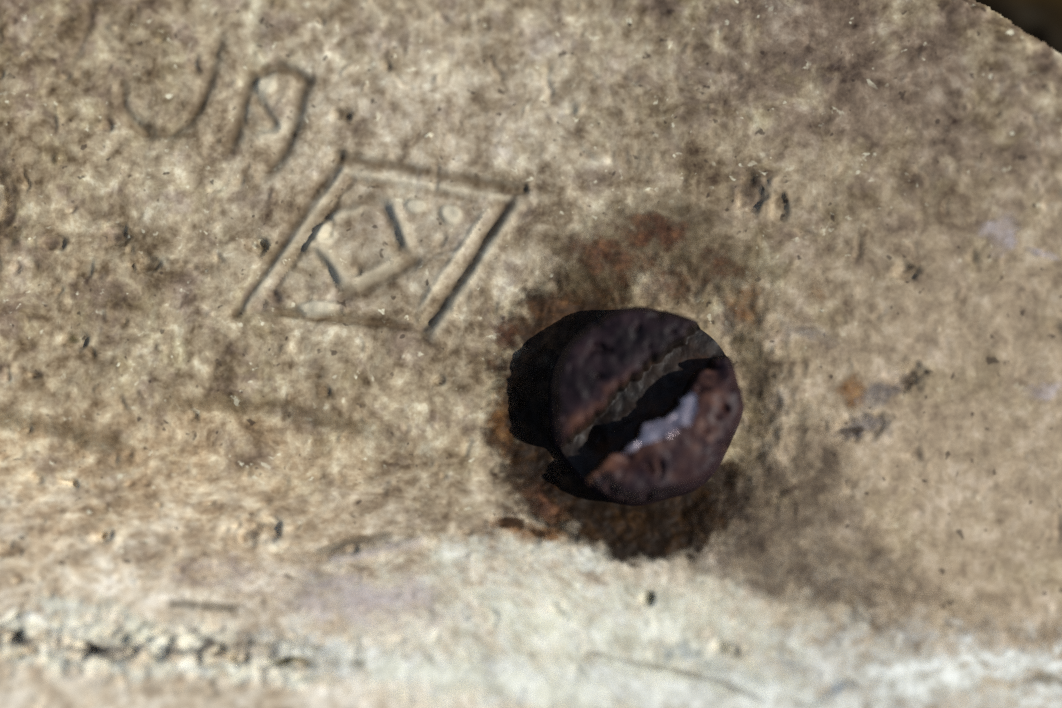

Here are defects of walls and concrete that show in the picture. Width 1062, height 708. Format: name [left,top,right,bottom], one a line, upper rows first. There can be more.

rust [485,209,757,567]
rust [733,334,771,441]